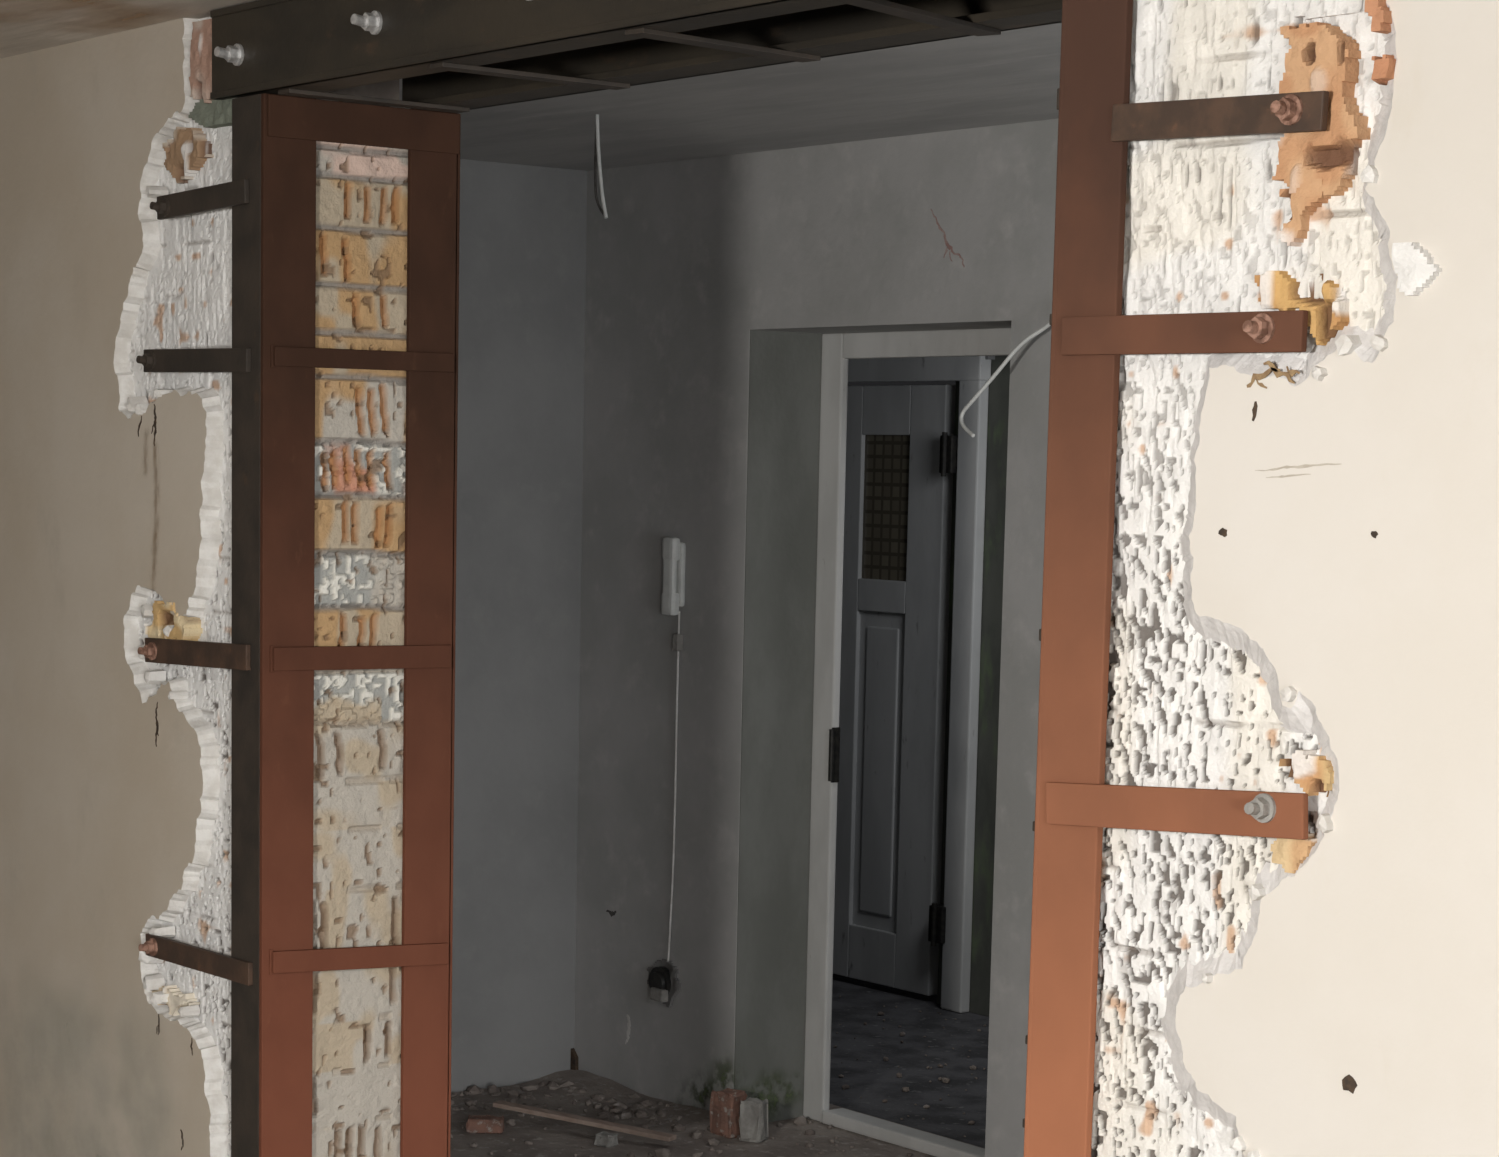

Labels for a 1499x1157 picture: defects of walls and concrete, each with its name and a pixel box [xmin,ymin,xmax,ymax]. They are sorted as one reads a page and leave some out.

flaking render [126,17,234,1157]
flaking render [1091,353,1334,1157]
flaking render [1122,0,1442,389]